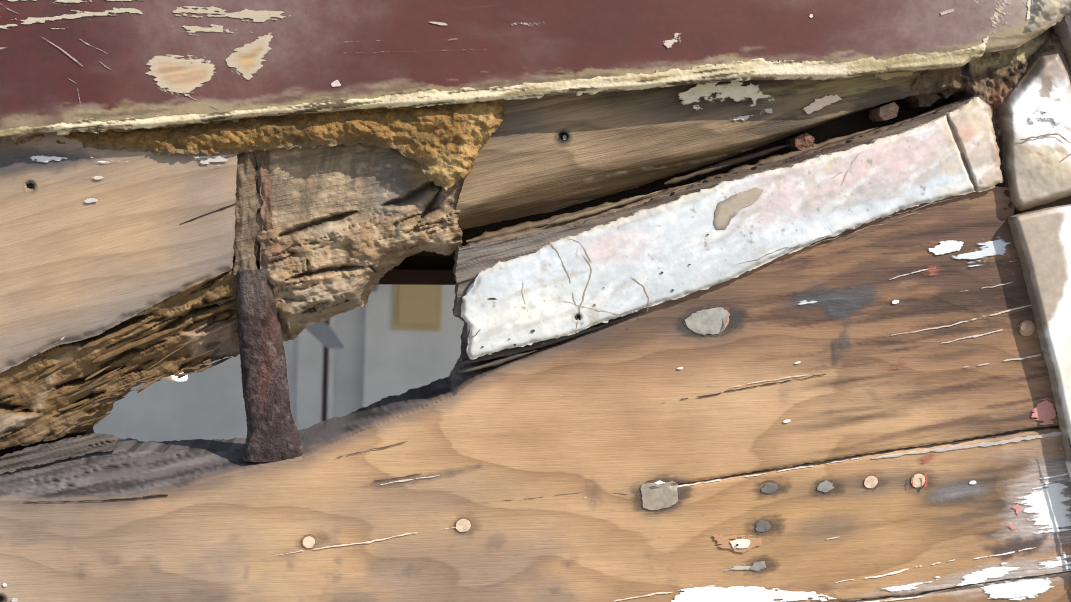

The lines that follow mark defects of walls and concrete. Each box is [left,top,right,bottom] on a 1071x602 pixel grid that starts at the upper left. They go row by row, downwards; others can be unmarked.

peeling [0,0,142,29]
peeling [145,6,290,98]
peeling [678,81,775,122]
peeling [803,94,842,114]
peeling [193,155,227,166]
rust [236,268,303,462]
crack [670,425,1062,487]